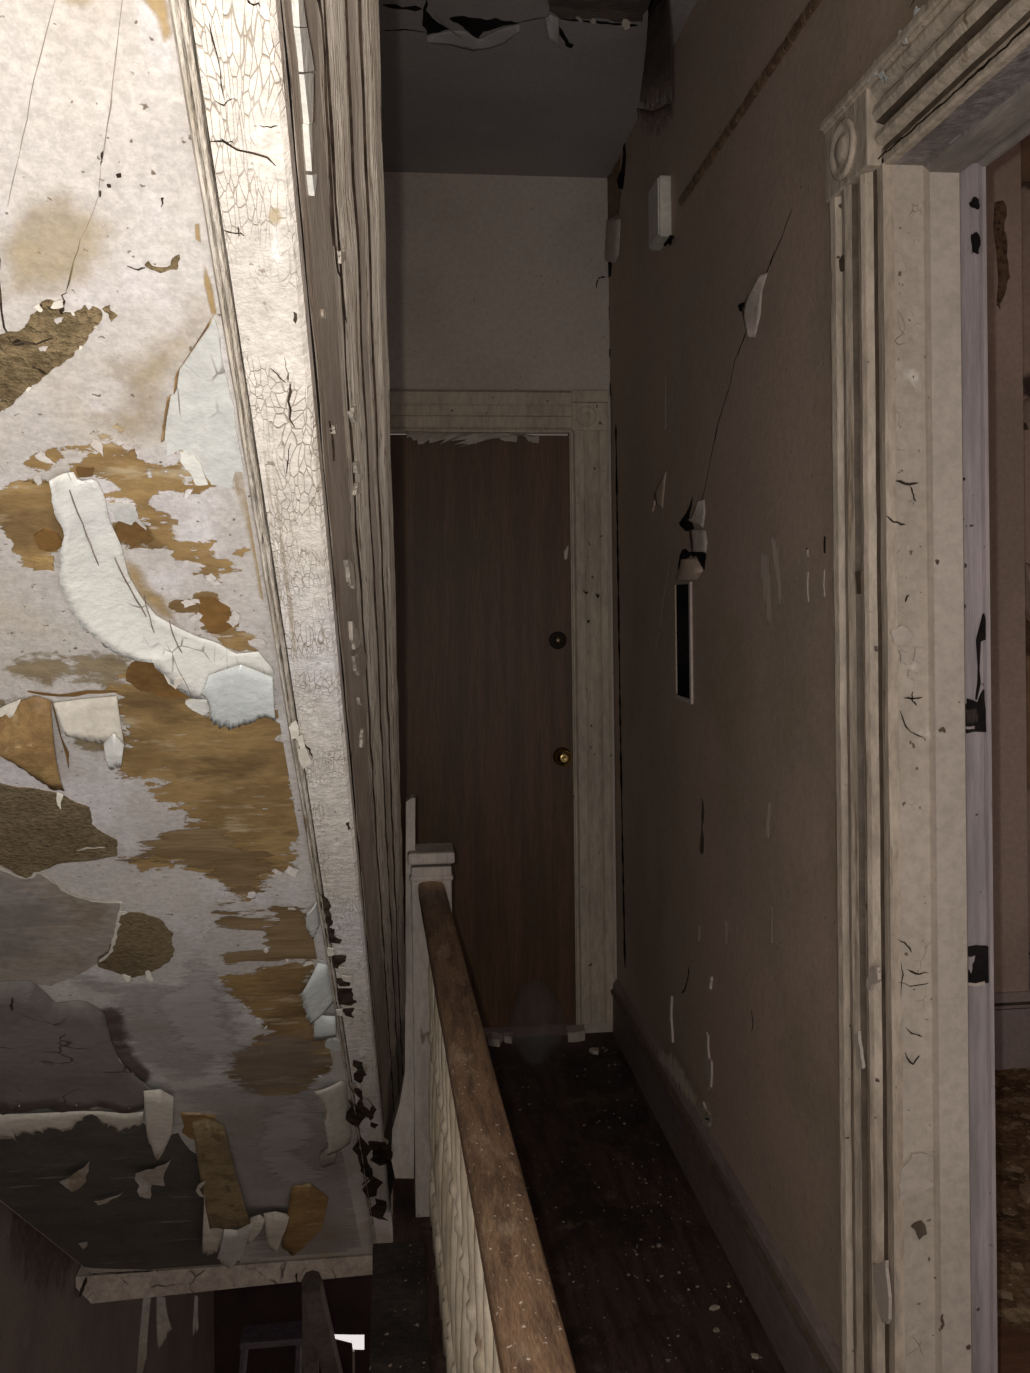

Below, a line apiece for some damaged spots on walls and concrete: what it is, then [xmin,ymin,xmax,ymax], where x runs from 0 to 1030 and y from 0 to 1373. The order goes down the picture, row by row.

crack [195,0,278,166]
peeling [545,15,559,47]
crack [317,0,348,337]
peeling [337,249,346,264]
crack [766,209,792,273]
crack [271,357,295,474]
crack [327,421,335,461]
crack [702,333,746,500]
peeling [0,299,393,1221]
flaking render [0,1109,240,1270]